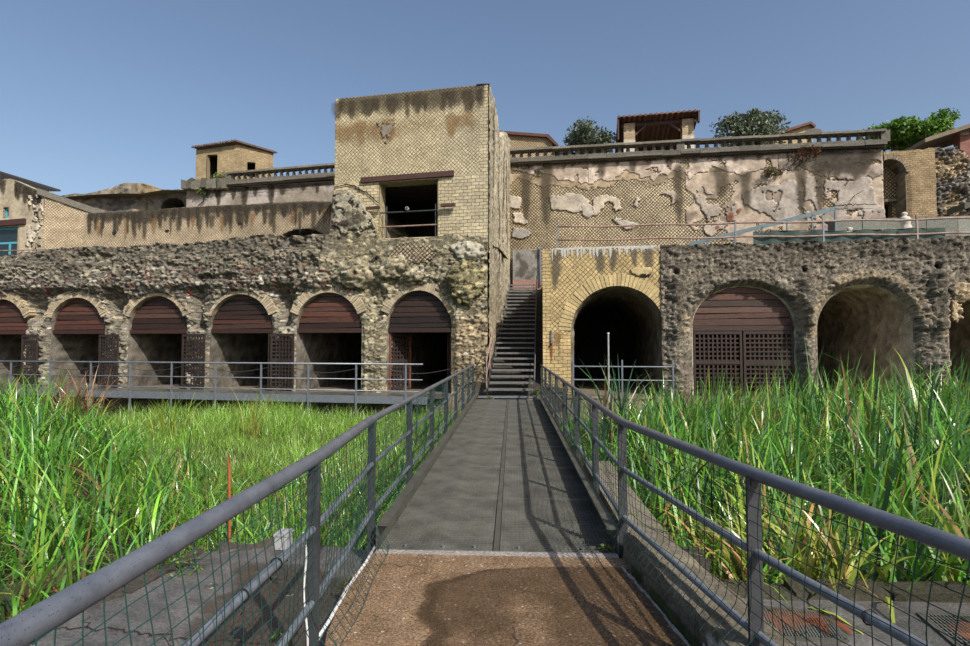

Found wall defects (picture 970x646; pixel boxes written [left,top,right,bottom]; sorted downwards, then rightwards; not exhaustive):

leakage [333,84,484,117]
leakage [87,181,335,233]
flaking render [510,149,886,244]
leakage [516,250,538,280]
leakage [552,245,660,284]
crack [57,616,267,646]
leakage [420,567,690,646]
corrosion [765,611,851,633]